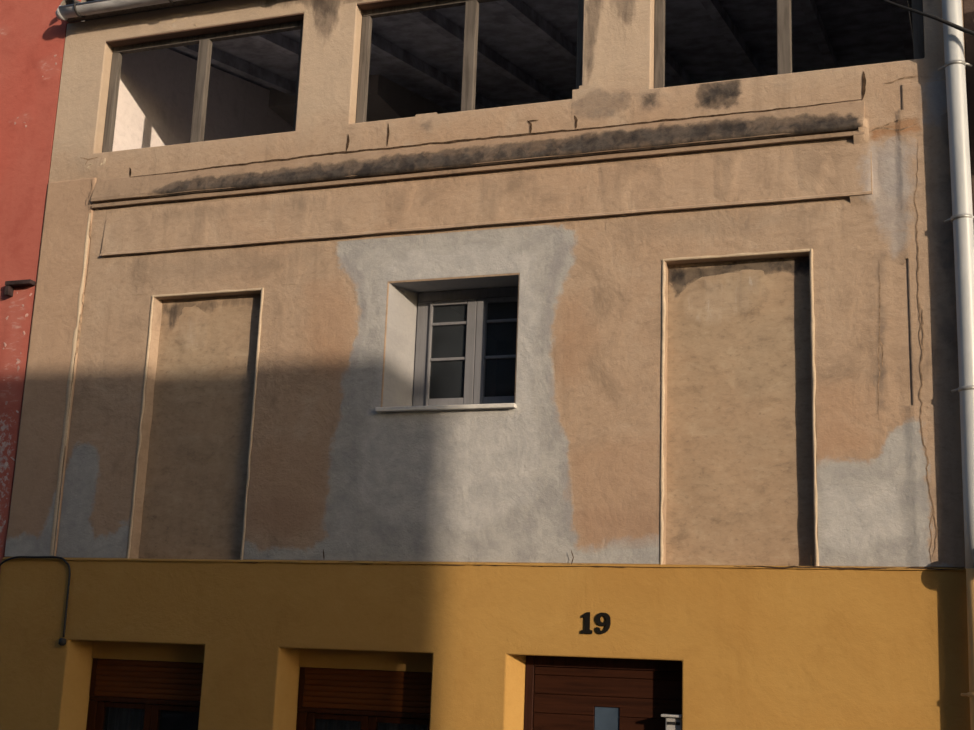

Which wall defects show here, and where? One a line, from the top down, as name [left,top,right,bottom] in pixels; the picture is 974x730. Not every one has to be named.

peeling [0,286,35,571]
damp [115,0,863,398]
crack [735,151,963,570]